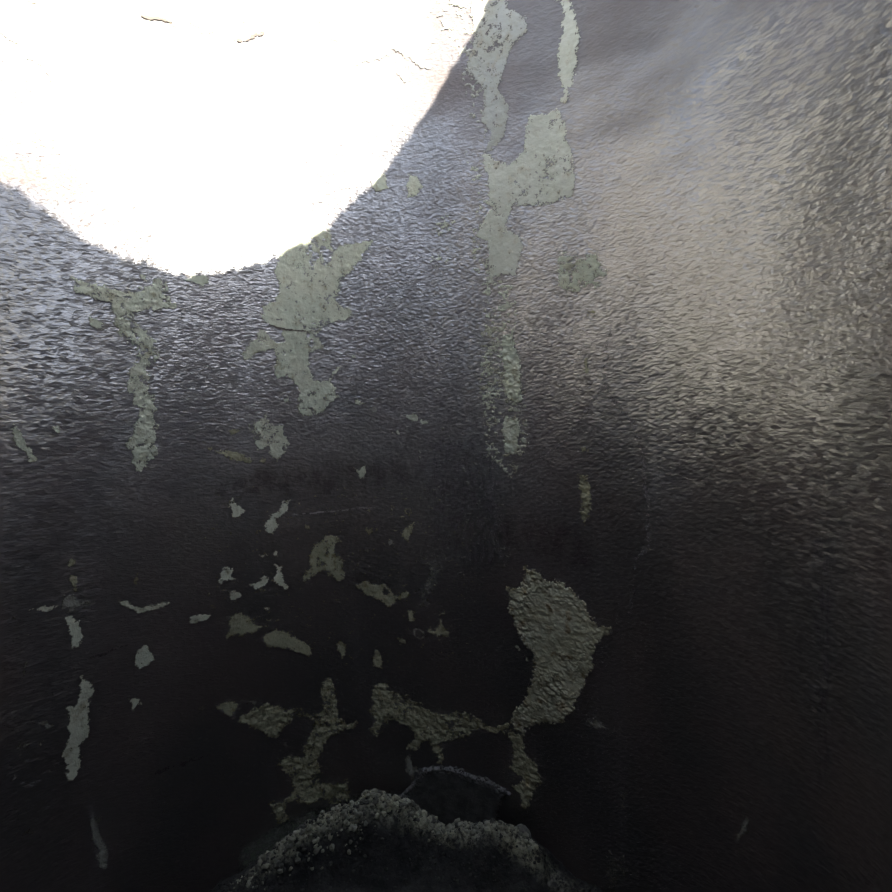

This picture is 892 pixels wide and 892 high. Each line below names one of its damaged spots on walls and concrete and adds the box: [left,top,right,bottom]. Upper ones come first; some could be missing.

peeling [14,129,373,417]
peeling [70,274,177,472]
peeling [12,423,37,462]
peeling [577,474,592,526]
peeling [28,559,93,649]
peeling [61,675,95,781]
peeling [133,645,155,669]
peeling [118,600,171,614]
peeling [216,677,359,824]
peeling [189,487,472,669]
spalling [369,565,613,809]
peeling [89,816,108,869]